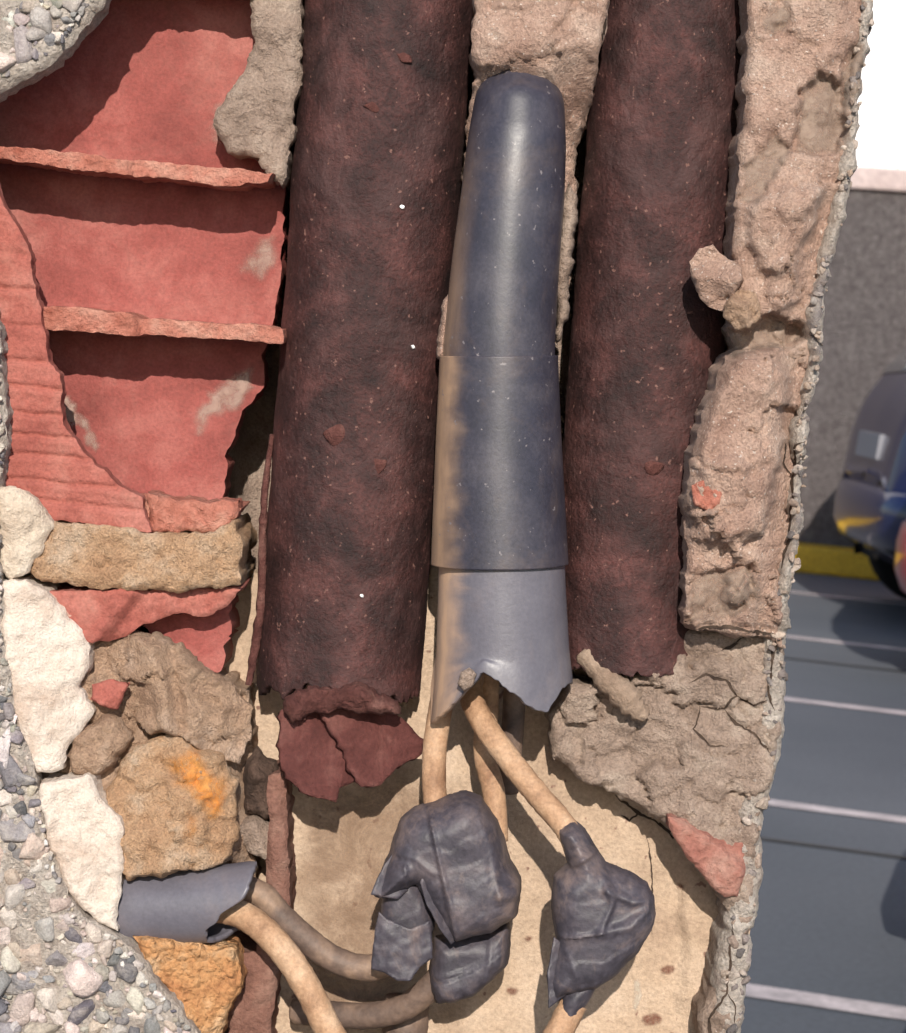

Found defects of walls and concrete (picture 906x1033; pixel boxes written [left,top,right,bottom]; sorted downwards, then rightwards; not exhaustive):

spalling [743,45,864,201]
spalling [721,315,812,356]
spalling [692,480,722,510]
spalling [691,567,759,620]
spalling [0,485,130,931]
crack [545,625,785,1033]